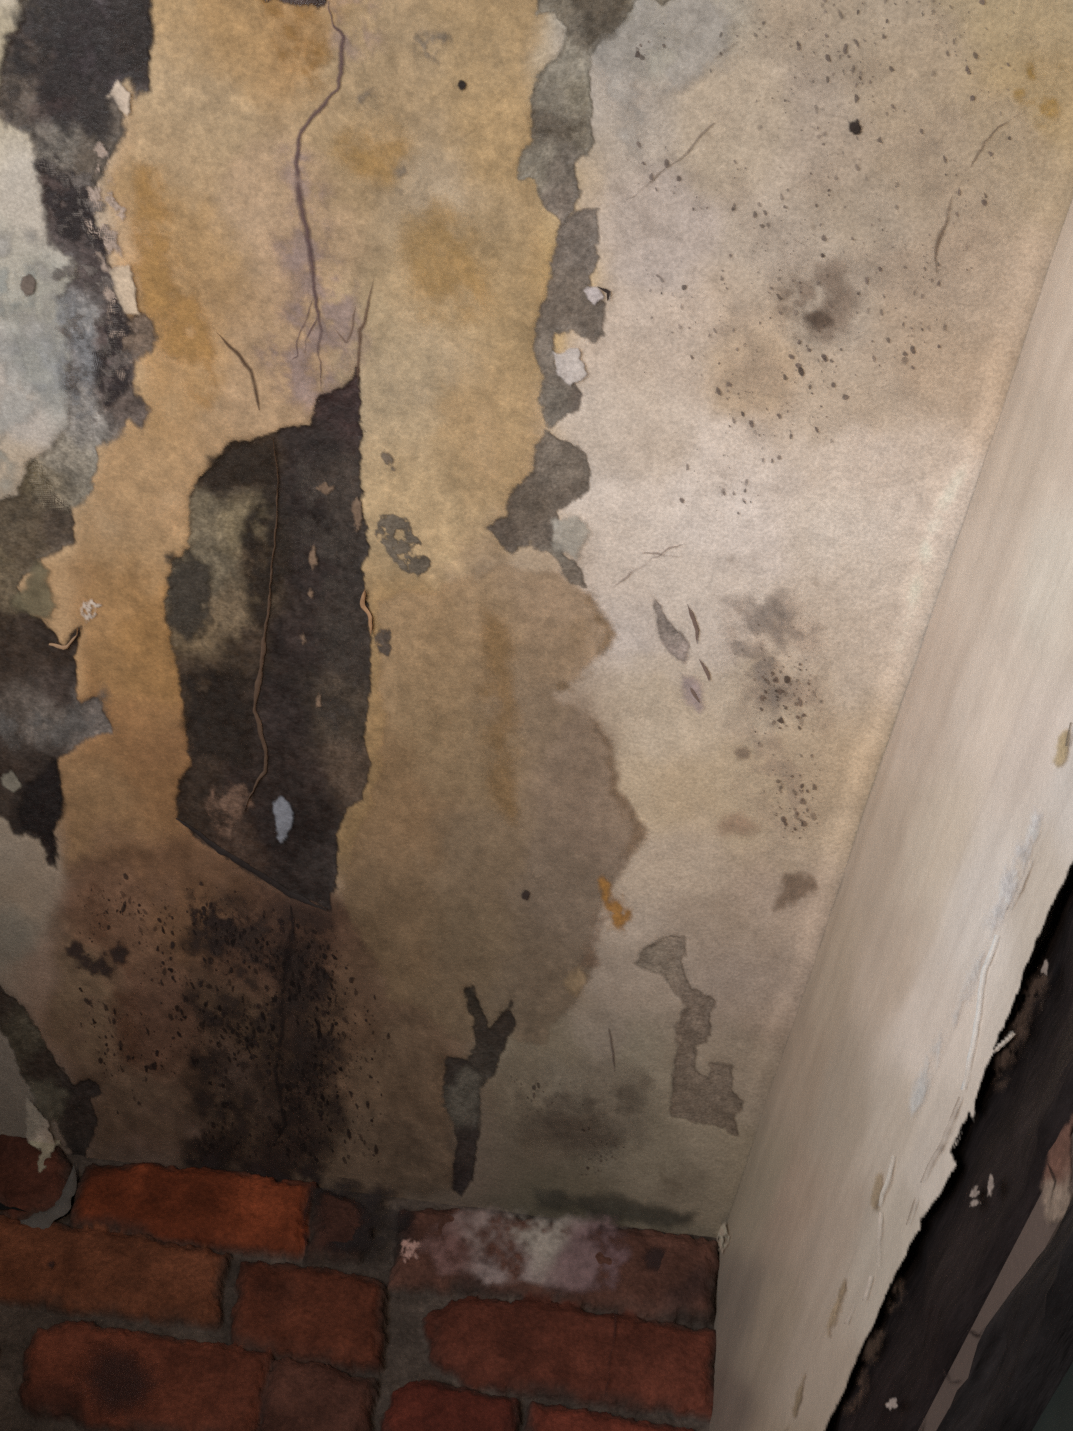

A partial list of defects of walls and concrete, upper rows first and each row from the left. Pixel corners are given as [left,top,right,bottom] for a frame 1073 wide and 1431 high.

leakage [755,0,1015,148]
crack [295,1,372,386]
flaking render [0,0,158,865]
crack [218,334,259,409]
leakage [715,172,940,463]
flaking render [164,366,430,911]
leakage [733,598,821,757]
leakage [772,754,819,839]
flaking render [0,986,101,1172]
flaking render [442,986,515,1196]
flaking render [635,935,743,1136]
leakage [401,1192,691,1291]